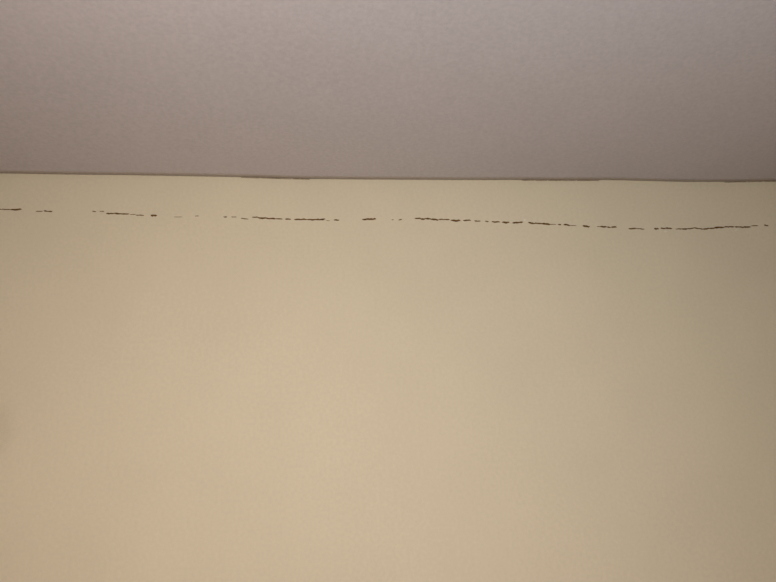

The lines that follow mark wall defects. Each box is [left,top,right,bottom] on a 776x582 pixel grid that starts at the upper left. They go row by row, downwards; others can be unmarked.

crack [92,210,157,218]
crack [225,214,339,222]
crack [362,218,768,232]